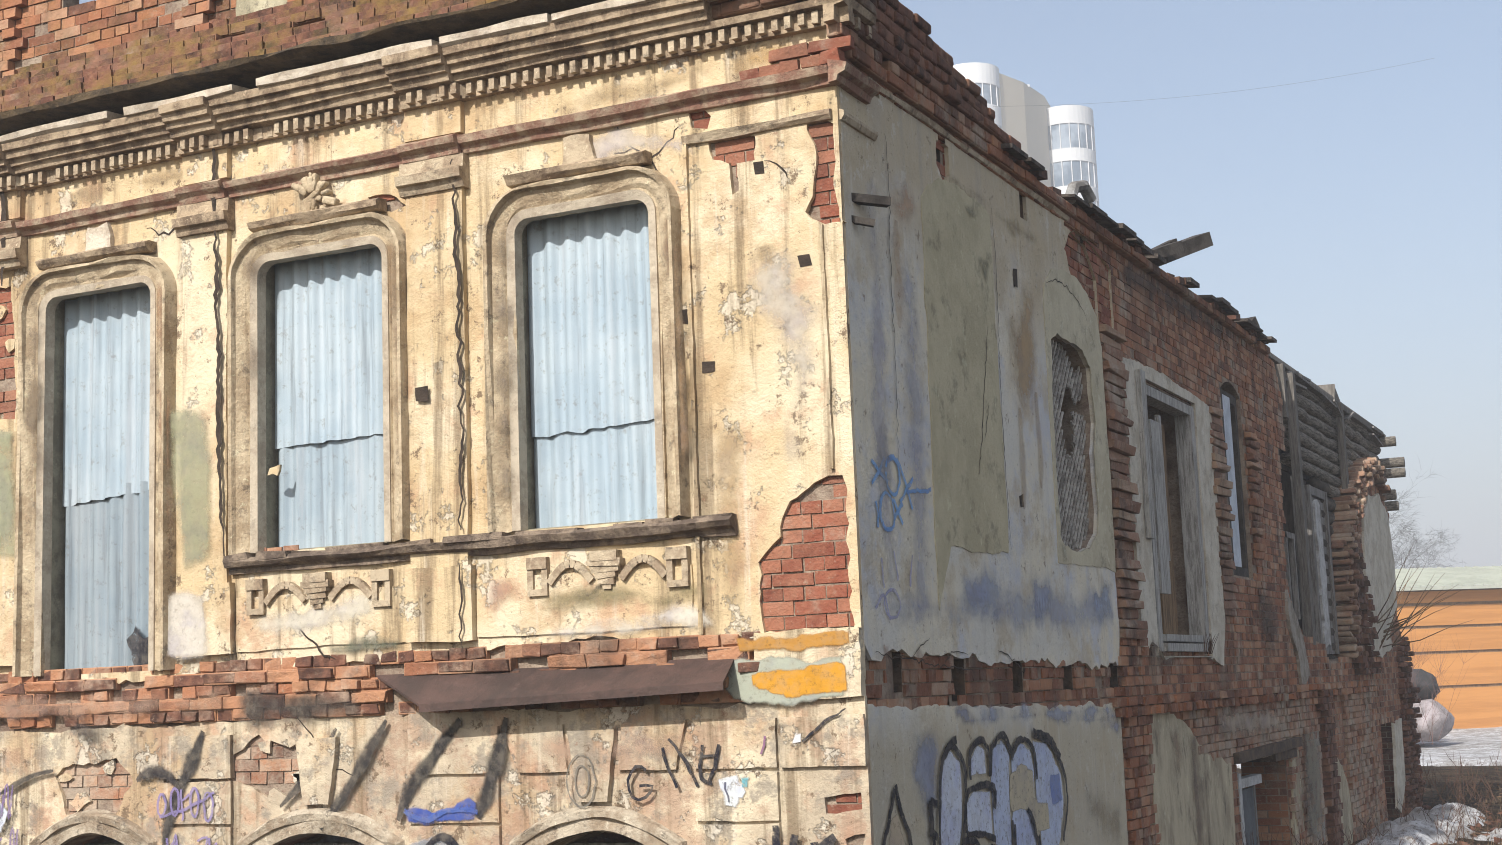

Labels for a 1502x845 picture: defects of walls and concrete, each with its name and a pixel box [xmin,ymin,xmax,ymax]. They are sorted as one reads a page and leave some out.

crack [147,227,175,236]
crack [211,149,225,556]
crack [450,158,465,649]
crack [979,208,1012,549]
flaking render [726,476,855,705]